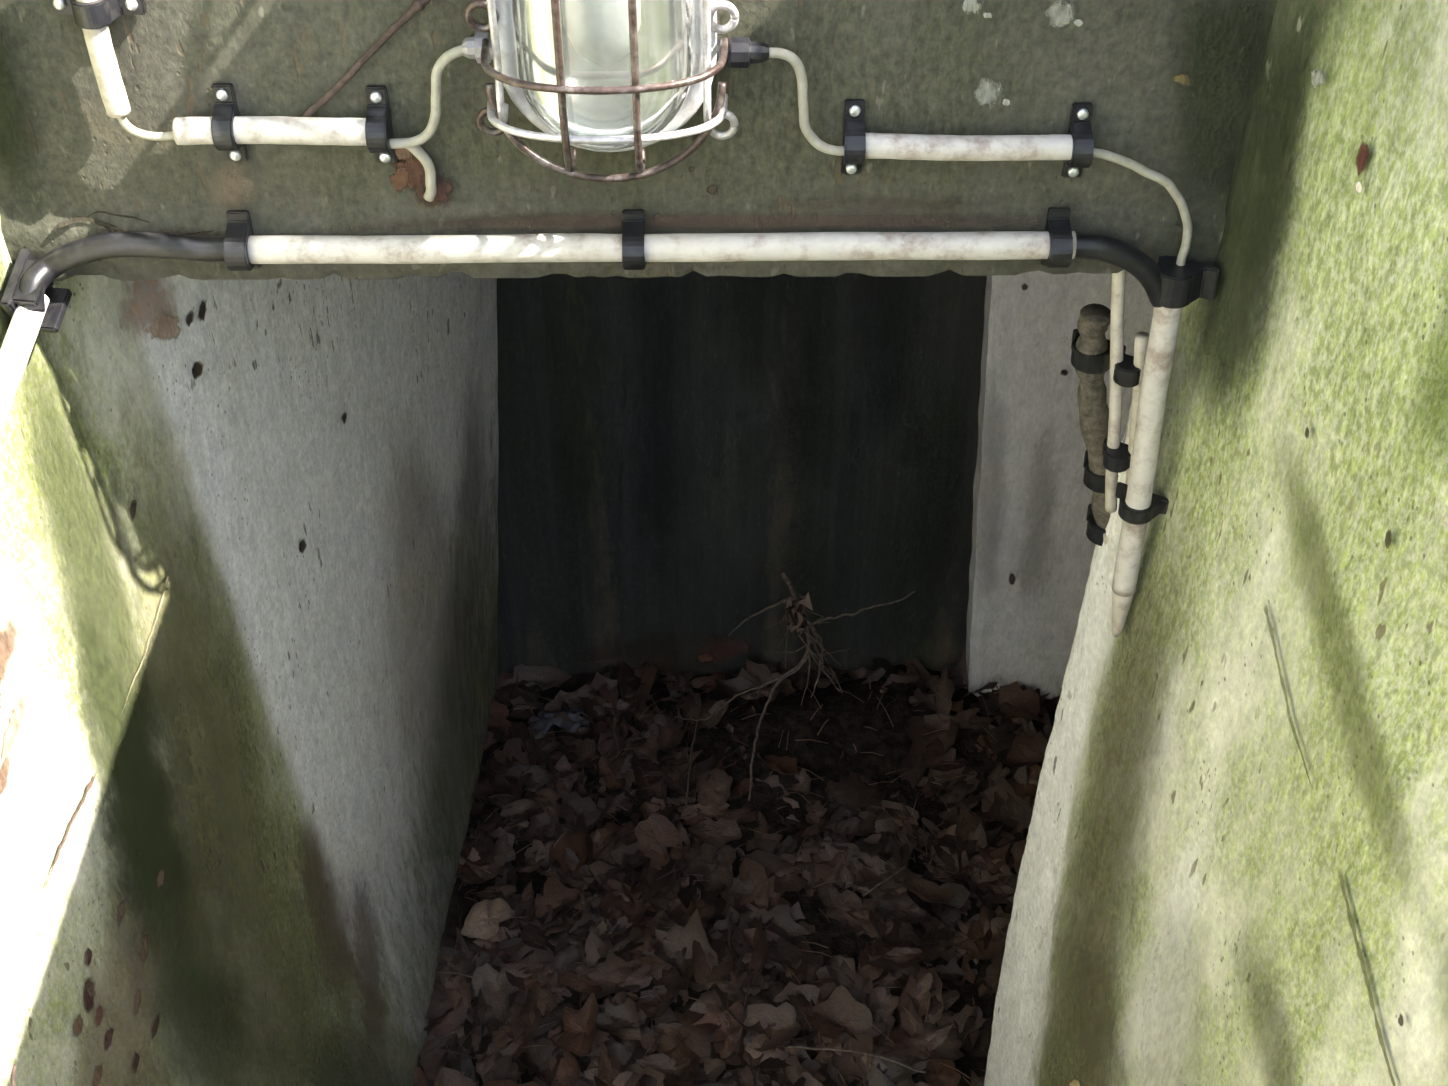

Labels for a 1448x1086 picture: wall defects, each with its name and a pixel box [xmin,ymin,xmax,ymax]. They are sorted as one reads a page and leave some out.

corrosion [390,148,453,207]
crack [1264,605,1313,788]
crack [1339,873,1396,1086]